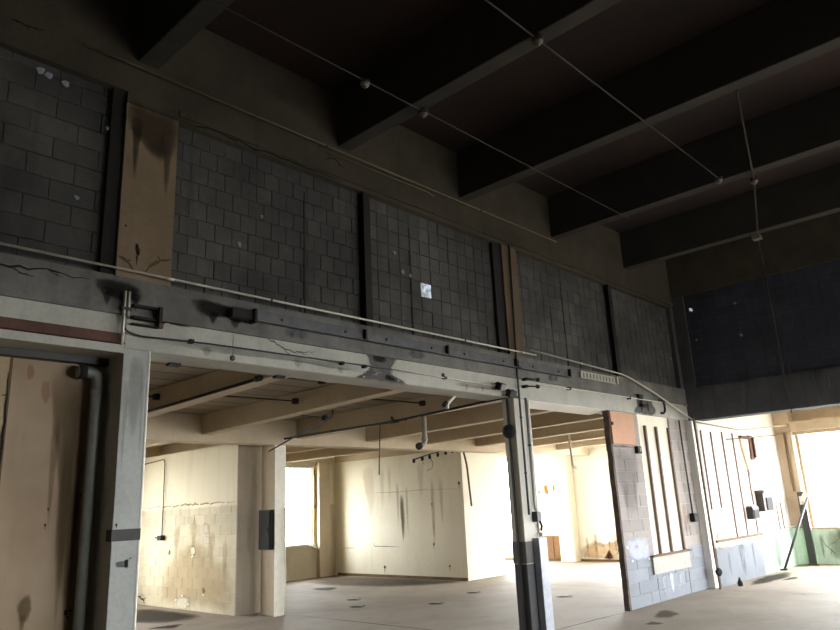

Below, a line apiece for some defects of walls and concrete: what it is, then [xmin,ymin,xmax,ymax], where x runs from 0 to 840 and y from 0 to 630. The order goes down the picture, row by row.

crack [0,263,91,280]